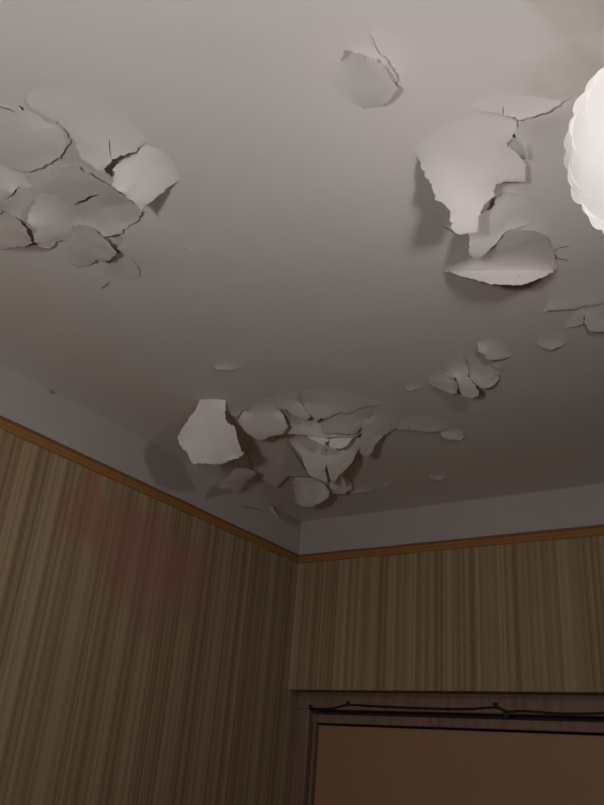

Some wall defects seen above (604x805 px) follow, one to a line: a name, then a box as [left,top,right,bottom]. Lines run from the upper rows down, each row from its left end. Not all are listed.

peeling [0,85,186,289]
peeling [412,92,580,286]
peeling [427,332,513,398]
peeling [536,280,604,350]
peeling [177,388,465,507]